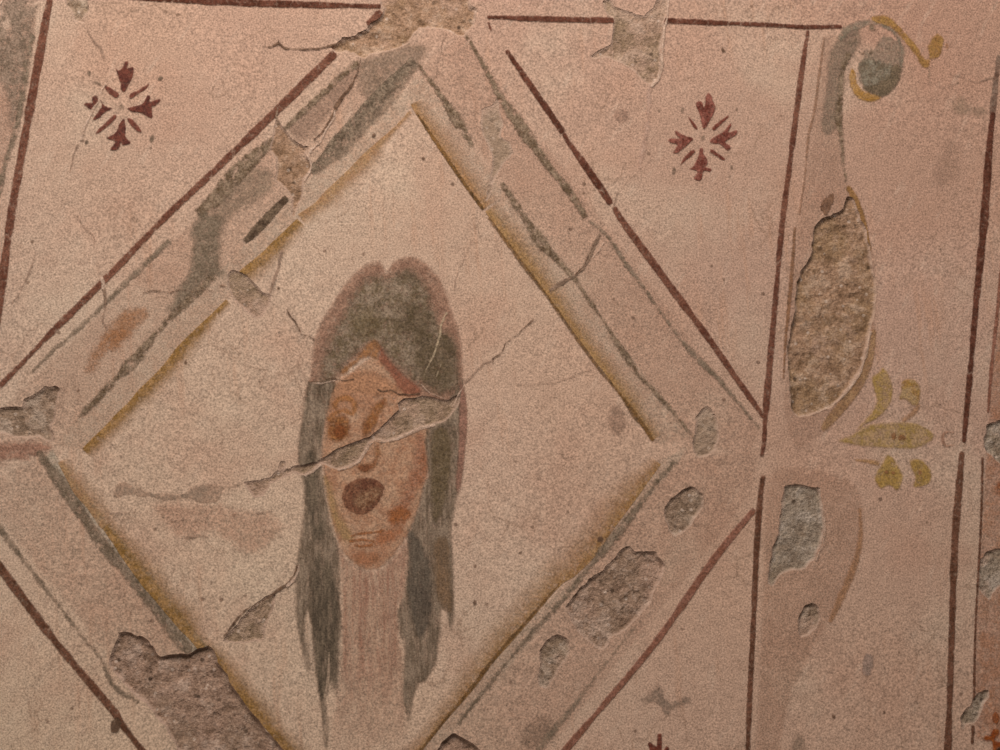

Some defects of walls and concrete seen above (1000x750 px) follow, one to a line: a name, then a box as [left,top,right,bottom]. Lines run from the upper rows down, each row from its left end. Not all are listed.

flaking render [65,0,89,23]
flaking render [331,0,477,58]
flaking render [590,0,669,87]
flaking render [787,193,877,418]
flaking render [0,386,60,458]
flaking render [983,420,1000,463]
flaking render [767,484,826,587]
flaking render [223,594,275,643]
flaking render [566,546,665,650]
flaking render [109,632,283,750]
flaking render [537,634,570,689]
flaking render [438,733,479,750]